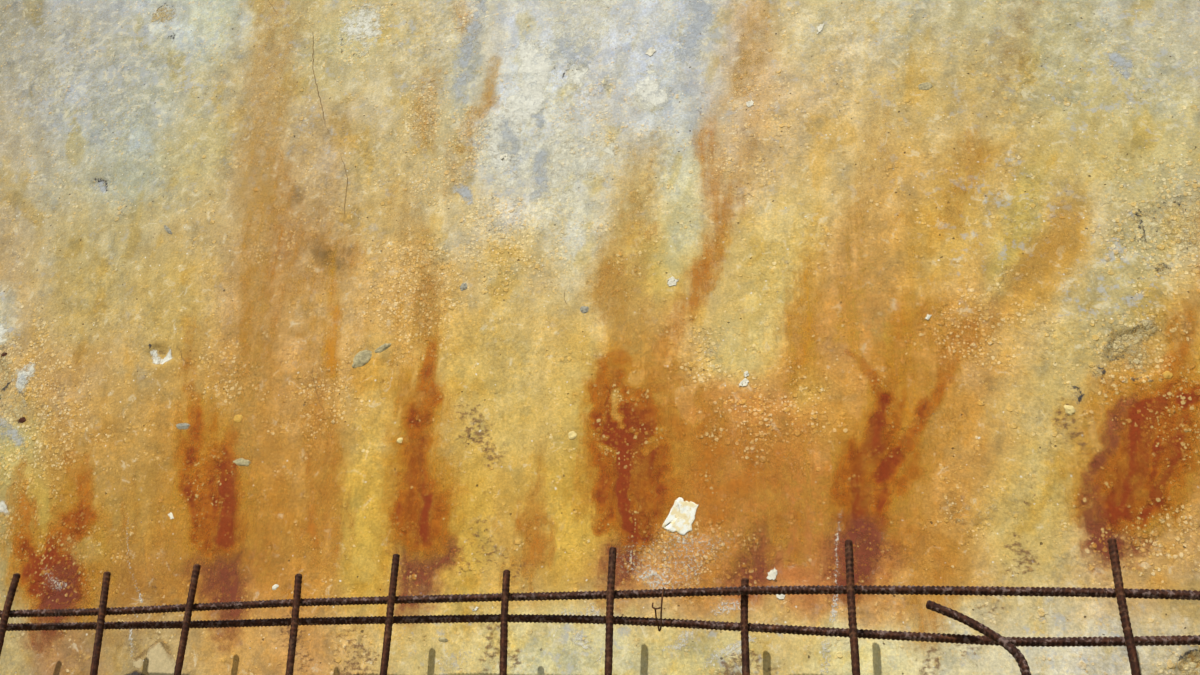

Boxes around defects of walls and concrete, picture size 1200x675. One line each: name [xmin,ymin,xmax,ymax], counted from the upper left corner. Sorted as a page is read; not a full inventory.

corrosion [3,472,100,646]
corrosion [173,398,253,637]
corrosion [322,270,340,378]
corrosion [388,344,458,616]
corrosion [578,183,817,597]
corrosion [828,336,955,633]
corrosion [1074,310,1200,562]